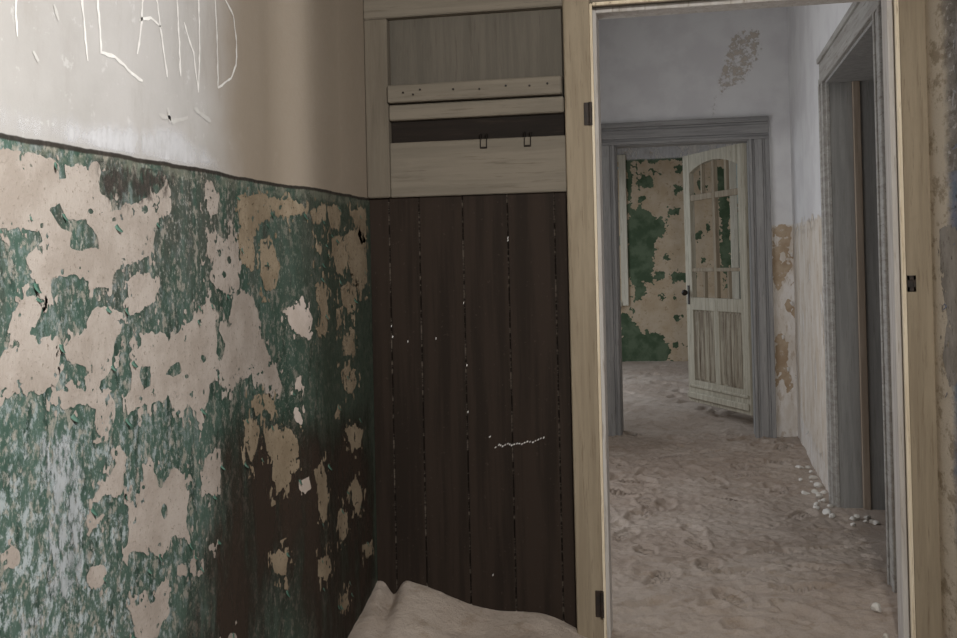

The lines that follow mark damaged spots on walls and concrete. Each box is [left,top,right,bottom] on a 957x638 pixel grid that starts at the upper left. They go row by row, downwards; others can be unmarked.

peeling [0,147,370,638]
peeling [617,151,738,362]
peeling [772,215,828,470]
peeling [938,224,957,397]
peeling [362,539,374,567]